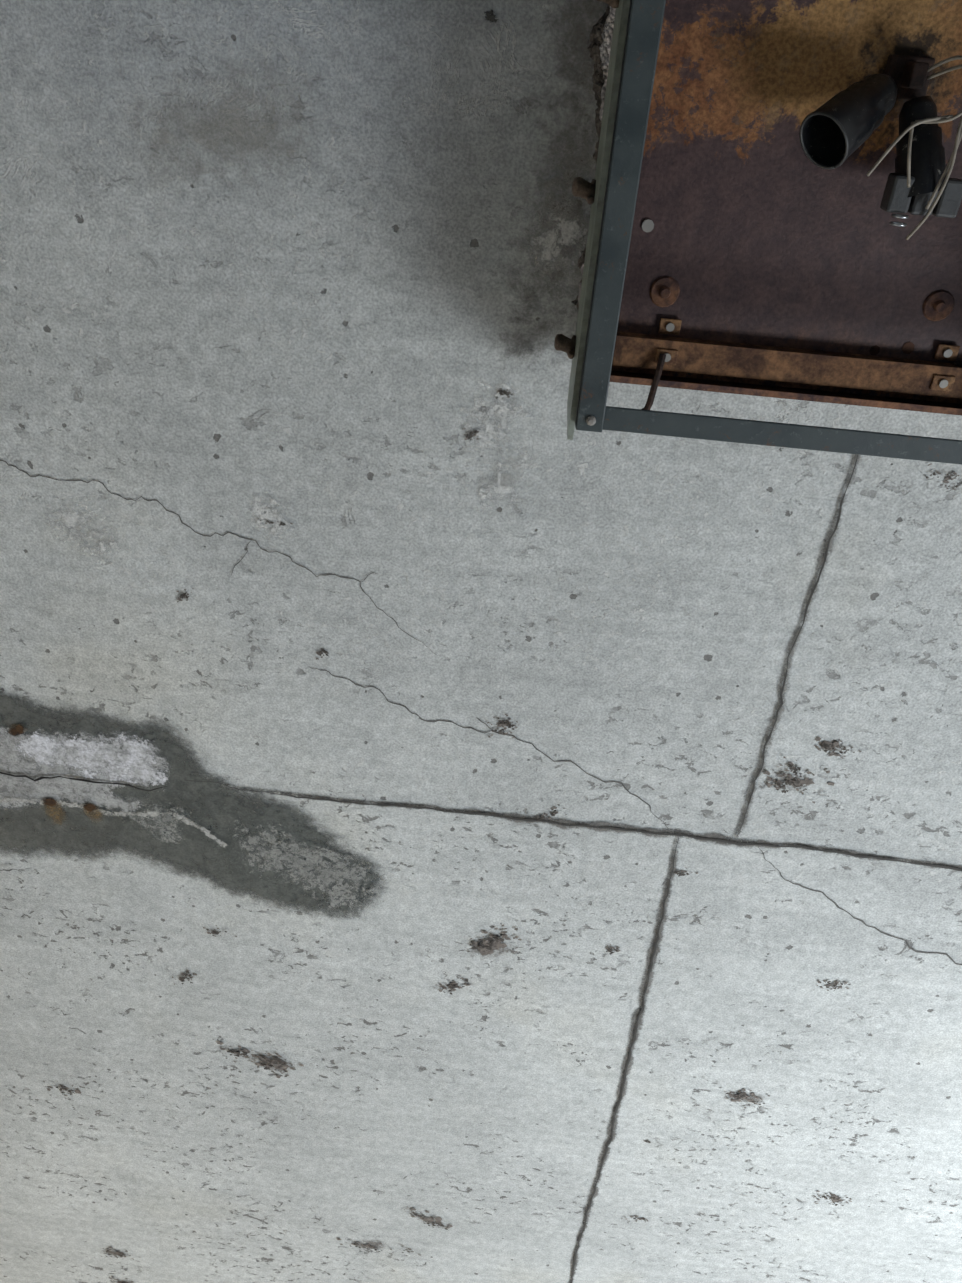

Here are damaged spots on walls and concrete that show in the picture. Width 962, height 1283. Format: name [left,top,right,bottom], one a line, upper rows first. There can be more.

spalling [588,5,610,162]
crack [0,460,437,655]
water stain [252,497,291,535]
crack [0,772,167,791]
water stain [0,692,380,918]
crack [312,668,667,827]
crack [758,847,962,965]